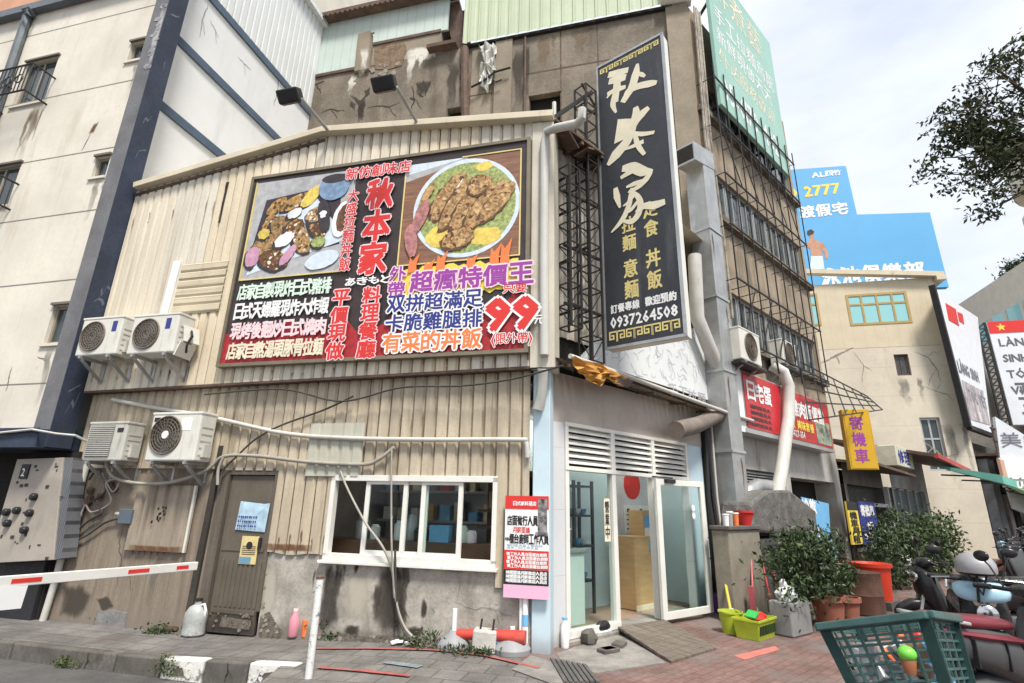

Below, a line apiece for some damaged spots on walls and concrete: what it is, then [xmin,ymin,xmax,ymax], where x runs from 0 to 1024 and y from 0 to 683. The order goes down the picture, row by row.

crack [315,81,421,118]
crack [823,347,870,380]
crack [916,351,954,401]
leakage [313,565,427,636]